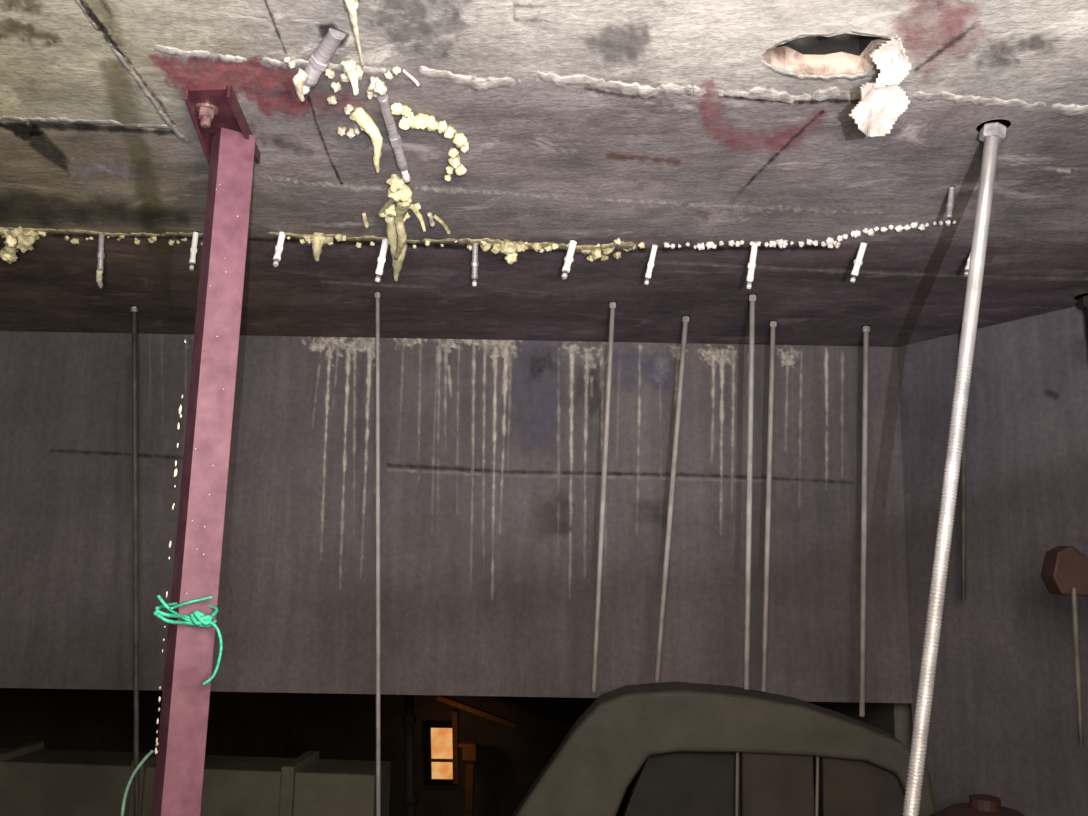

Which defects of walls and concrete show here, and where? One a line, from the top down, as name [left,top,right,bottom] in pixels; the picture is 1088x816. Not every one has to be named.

crack [75,0,188,142]
spalling [760,30,911,137]
crack [915,37,960,71]
leakage [1019,37,1044,48]
crack [270,97,386,191]
crack [415,186,558,198]
crack [586,198,726,206]
crack [750,111,823,181]
leakage [311,337,375,472]
leakage [467,339,515,450]
leakage [566,346,603,462]
leakage [702,350,729,423]